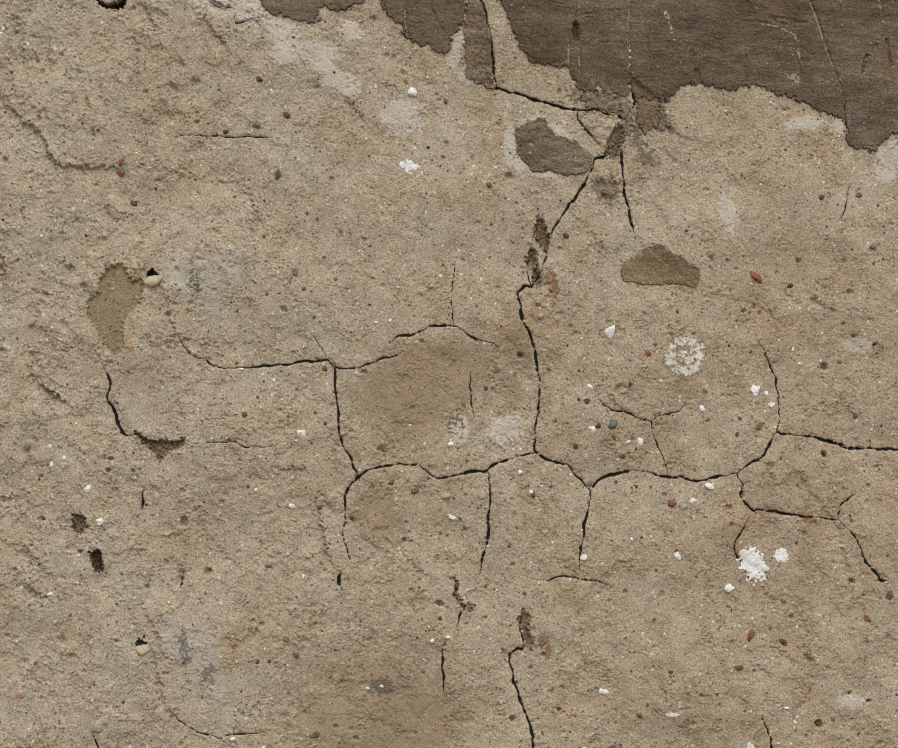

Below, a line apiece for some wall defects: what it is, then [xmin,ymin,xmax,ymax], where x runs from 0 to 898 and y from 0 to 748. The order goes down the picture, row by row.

flaking render [261,0,364,23]
flaking render [380,0,467,54]
flaking render [501,0,898,213]
crack [180,0,898,589]
crack [103,367,132,436]
crack [441,609,464,693]
crack [508,618,534,748]
crack [175,715,261,739]